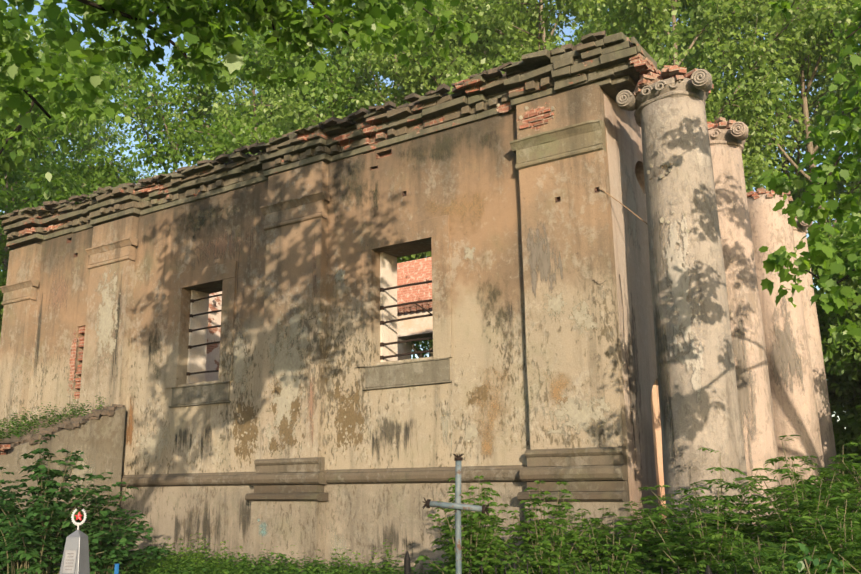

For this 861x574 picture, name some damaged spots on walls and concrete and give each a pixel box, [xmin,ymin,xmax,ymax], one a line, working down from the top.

spalling [496,101,555,131]
peeling [229,296,323,471]
leakage [372,419,410,458]
leakage [175,503,220,548]
leakage [239,500,251,535]